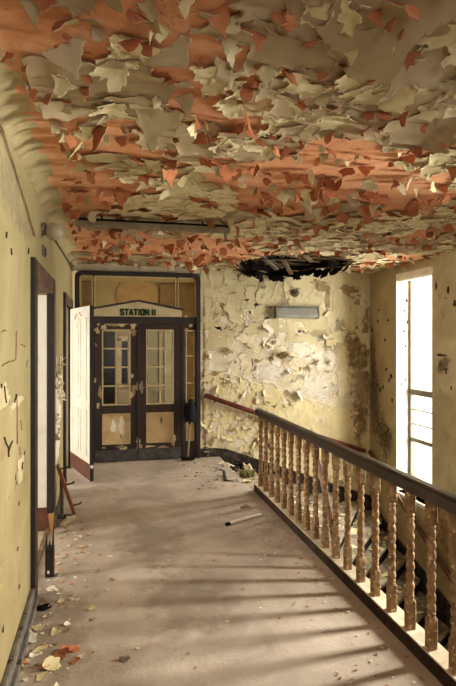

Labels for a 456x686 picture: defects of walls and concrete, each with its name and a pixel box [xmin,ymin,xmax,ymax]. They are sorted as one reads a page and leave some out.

peeling [0,0,456,499]
damp [346,307,370,445]